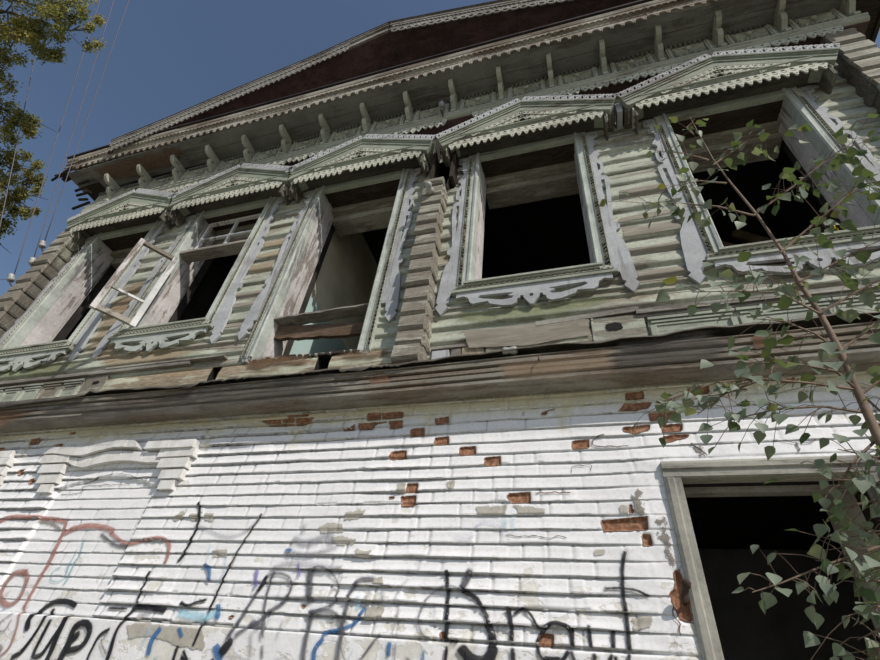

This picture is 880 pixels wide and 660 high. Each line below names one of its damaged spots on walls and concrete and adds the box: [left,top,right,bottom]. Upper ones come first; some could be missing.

spalling [261,414,314,427]
spalling [343,412,449,445]
spalling [619,391,689,443]
spalling [389,450,407,460]
spalling [459,446,501,466]
spalling [572,439,590,449]
crack [61,473,170,495]
spalling [389,483,418,506]
spalling [601,488,694,623]